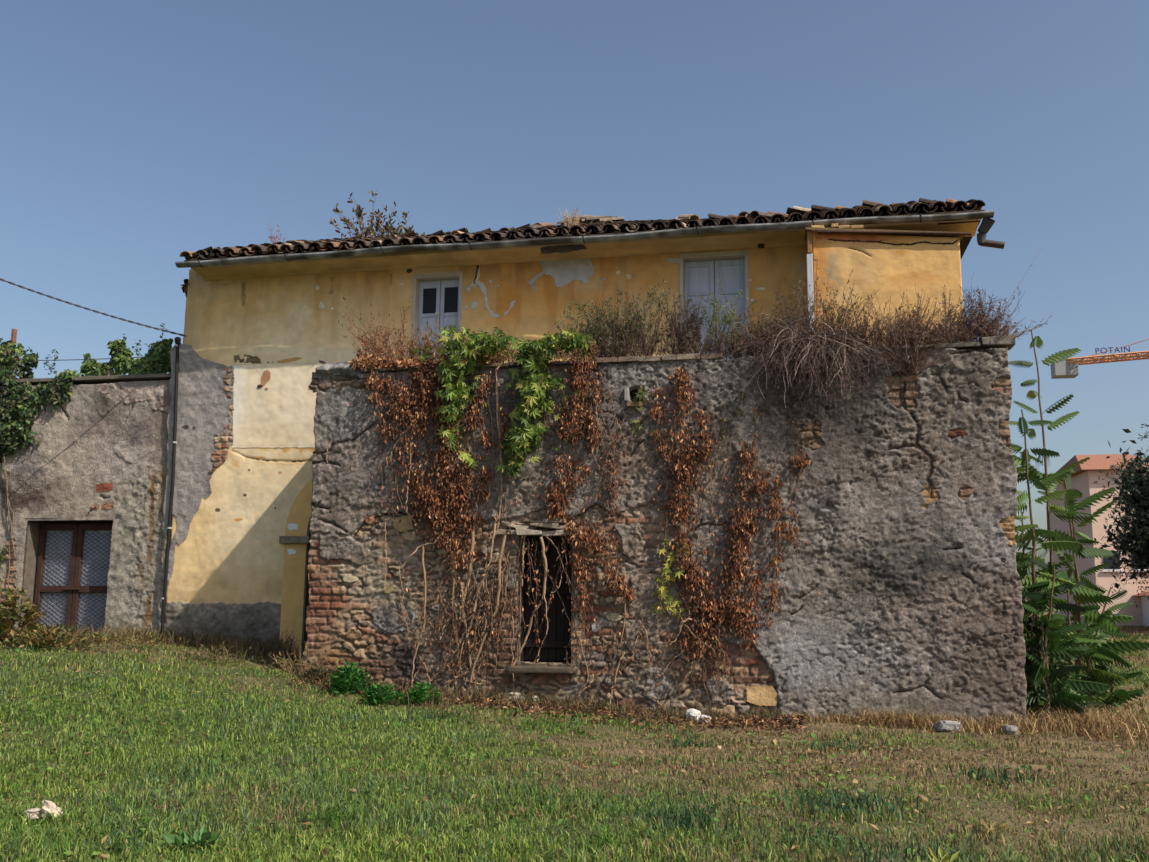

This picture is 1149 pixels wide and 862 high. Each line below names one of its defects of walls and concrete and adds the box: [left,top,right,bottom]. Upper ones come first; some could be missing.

peeling [464,268,516,318]
crack [829,238,958,257]
peeling [99,284,372,594]
crack [243,423,375,466]
crack [887,348,993,497]
flaking render [303,499,779,718]